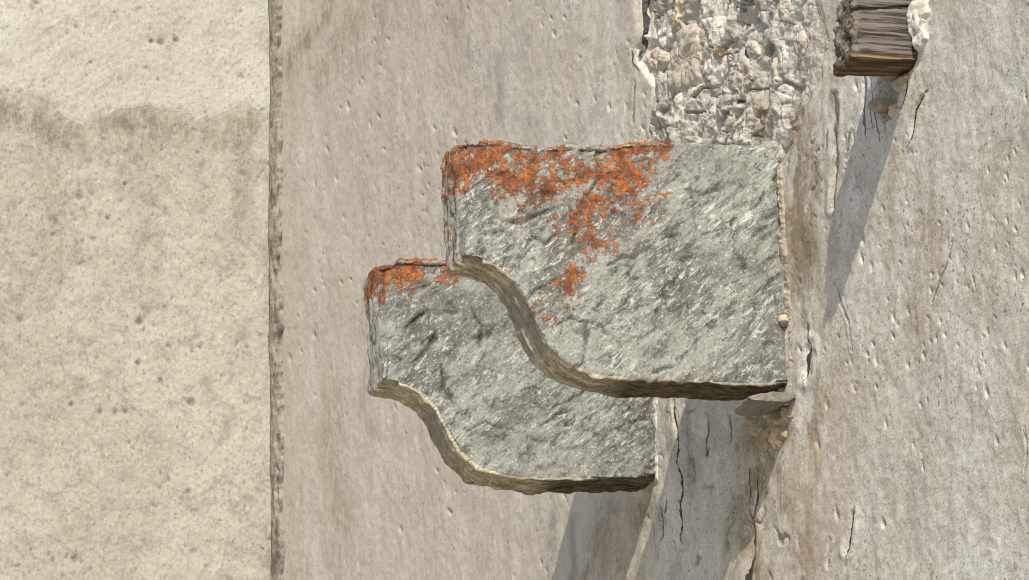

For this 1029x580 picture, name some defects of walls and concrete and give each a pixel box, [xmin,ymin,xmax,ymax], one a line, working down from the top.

flaking render [906,0,931,53]
crack [631,0,661,127]
flaking render [642,0,829,165]
flaking render [868,73,910,118]
crack [901,81,929,150]
crack [802,323,812,391]
crack [660,406,684,544]
crack [745,468,759,580]
crack [828,503,855,567]